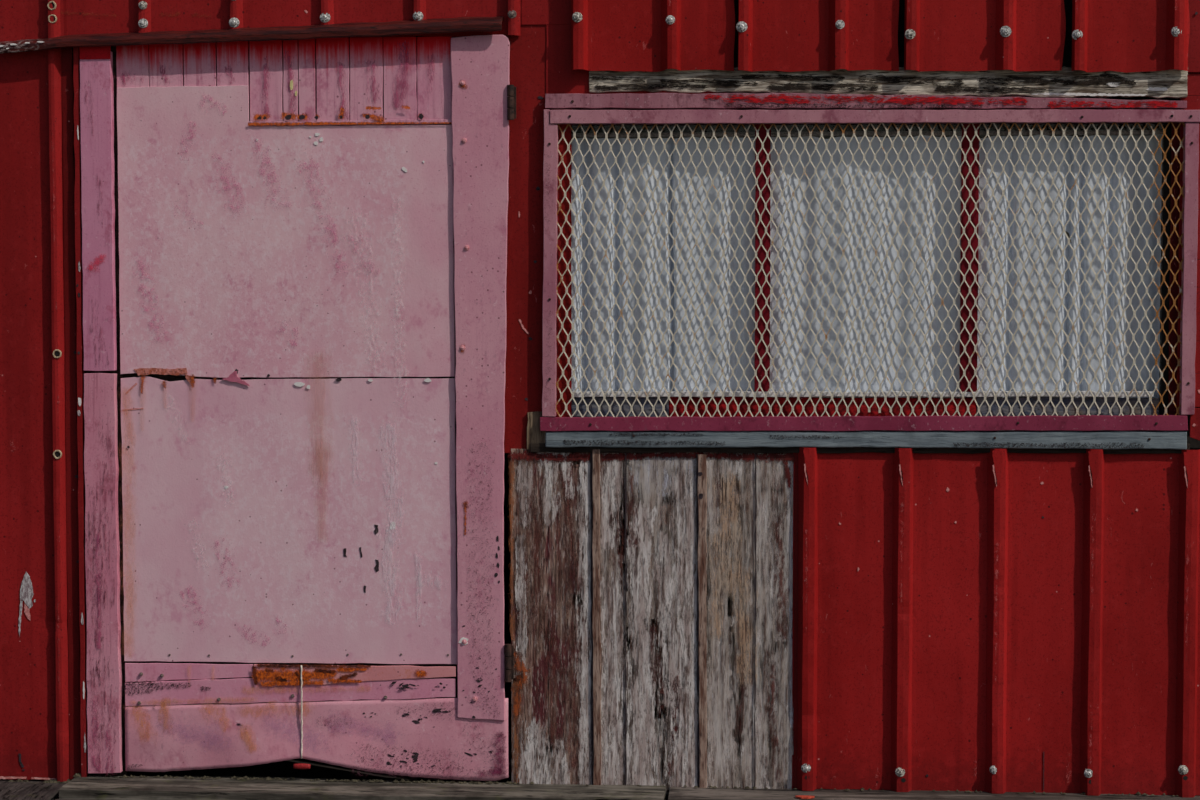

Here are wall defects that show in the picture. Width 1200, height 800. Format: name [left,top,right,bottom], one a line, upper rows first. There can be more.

peeling [704,82,1178,109]
rust [248,105,452,126]
rust [134,368,195,394]
peeling [19,572,36,636]
peeling [513,449,814,798]
rust [252,667,367,687]
peeling [371,750,435,768]